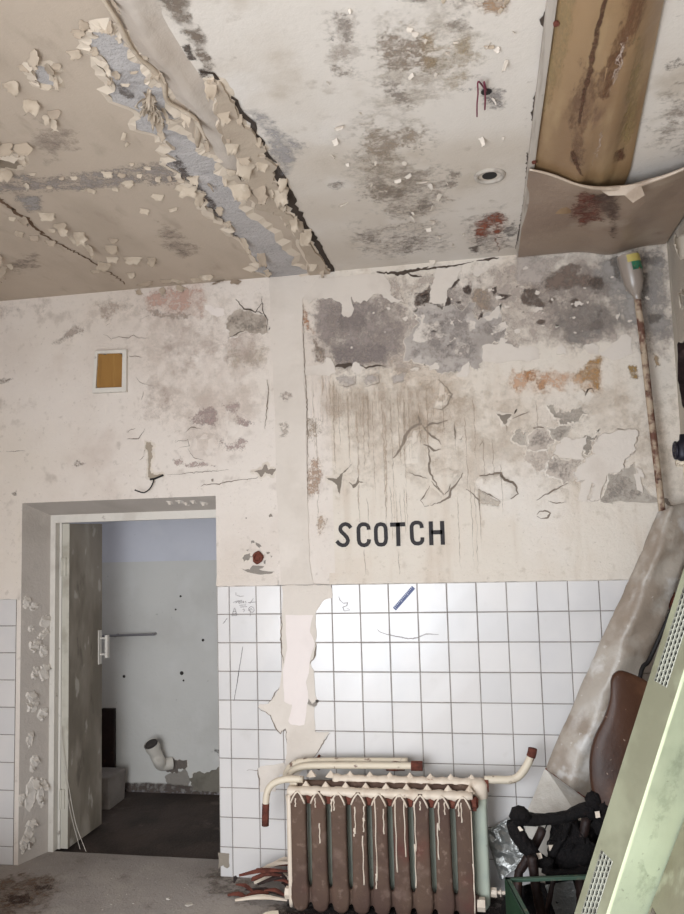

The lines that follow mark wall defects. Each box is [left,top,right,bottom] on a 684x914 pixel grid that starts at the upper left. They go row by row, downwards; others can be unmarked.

leakage [379,36,434,70]
peeling [151,76,330,278]
leakage [362,130,416,173]
crack [0,198,125,284]
spalling [392,288,540,384]
corrosion [514,356,602,390]
spalling [669,219,684,407]
leakage [307,461,322,494]
crack [393,379,568,519]
peeling [495,404,677,508]
spalling [258,585,333,775]
spalling [165,757,219,794]